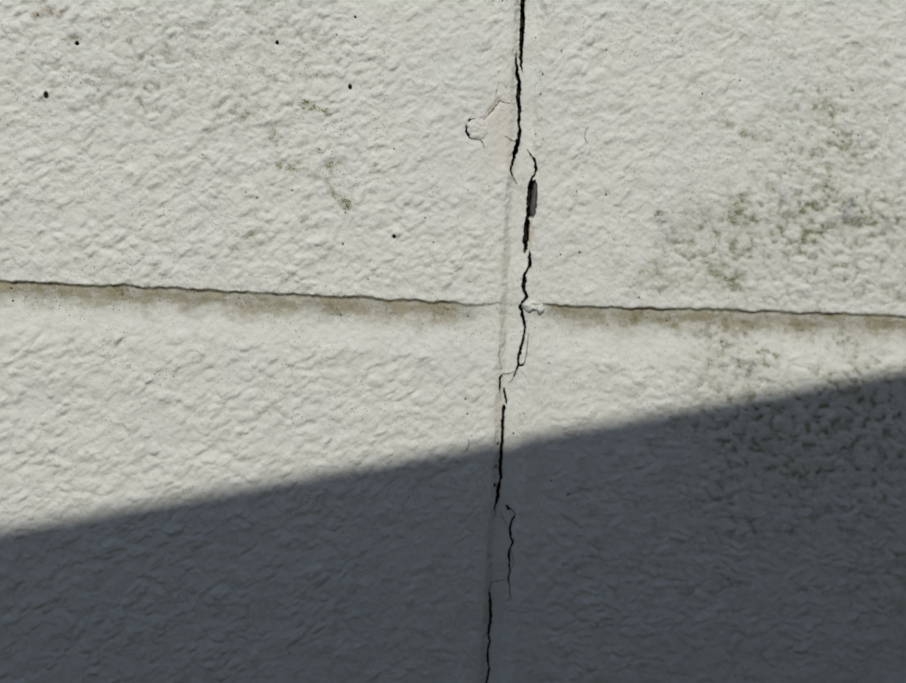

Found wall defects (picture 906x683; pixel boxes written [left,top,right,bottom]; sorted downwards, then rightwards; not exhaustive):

crack [485,0,537,683]